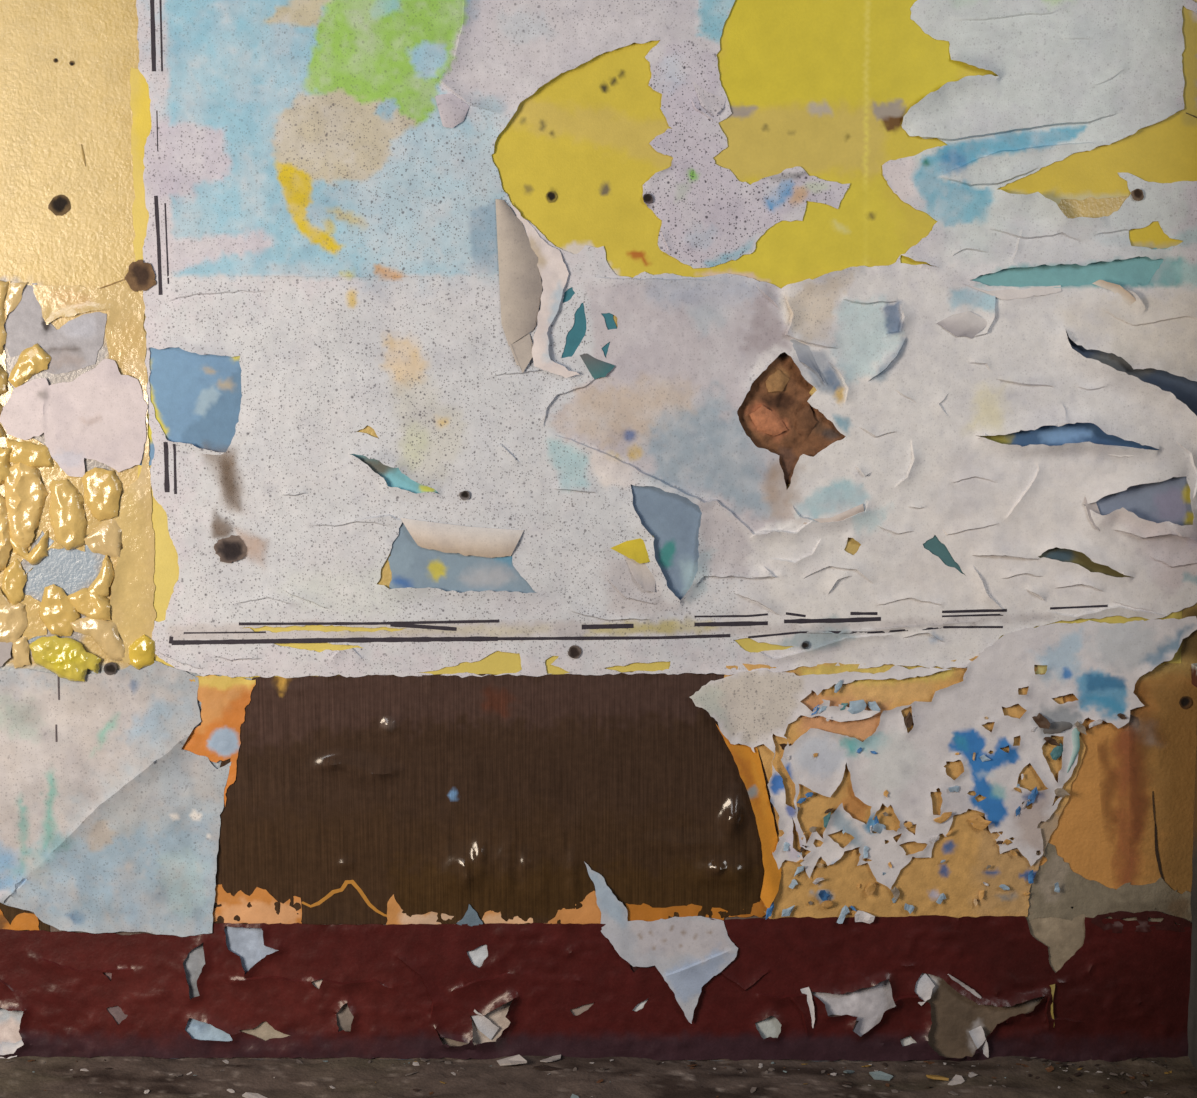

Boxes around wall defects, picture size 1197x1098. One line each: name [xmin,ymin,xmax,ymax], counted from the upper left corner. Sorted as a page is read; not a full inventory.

flaking render [4,283,107,374]
flaking render [737,352,846,486]
peeling [690,616,1197,973]
peeling [183,942,205,999]
peeling [224,926,279,974]
peeling [467,945,488,968]
peeling [0,1008,23,1044]
peeling [185,1018,290,1041]
peeling [439,1000,513,1046]
peeling [755,1015,781,1039]
peeling [811,979,896,1037]
peeling [900,973,1045,1058]